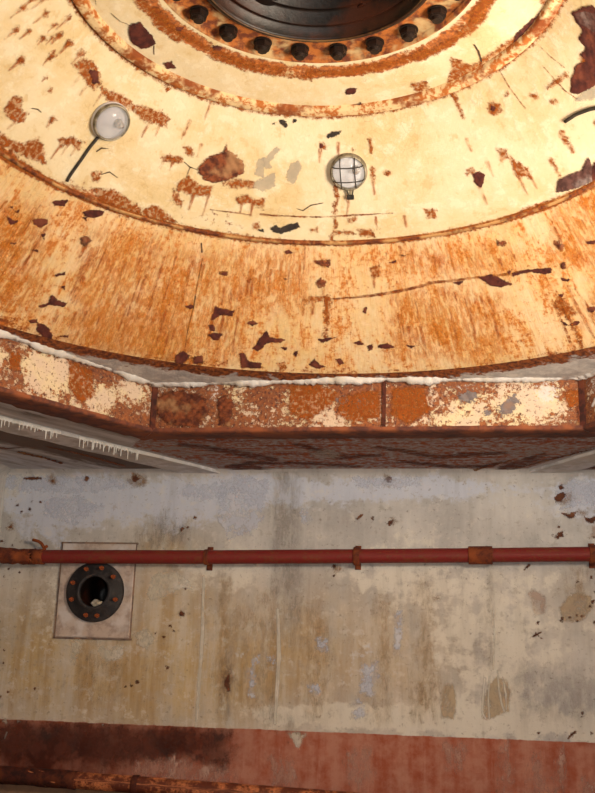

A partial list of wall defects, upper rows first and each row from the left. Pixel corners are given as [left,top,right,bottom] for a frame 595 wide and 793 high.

corrosion [11,11,171,136]
peeling [111,13,156,54]
corrosion [134,0,493,82]
peeling [547,5,595,102]
corrosion [0,132,85,164]
corrosion [91,171,178,223]
corrosion [172,175,212,209]
spalling [198,145,279,191]
peeling [556,157,595,193]
leakage [0,416,61,439]
leakage [79,435,140,460]
leakage [223,669,233,692]